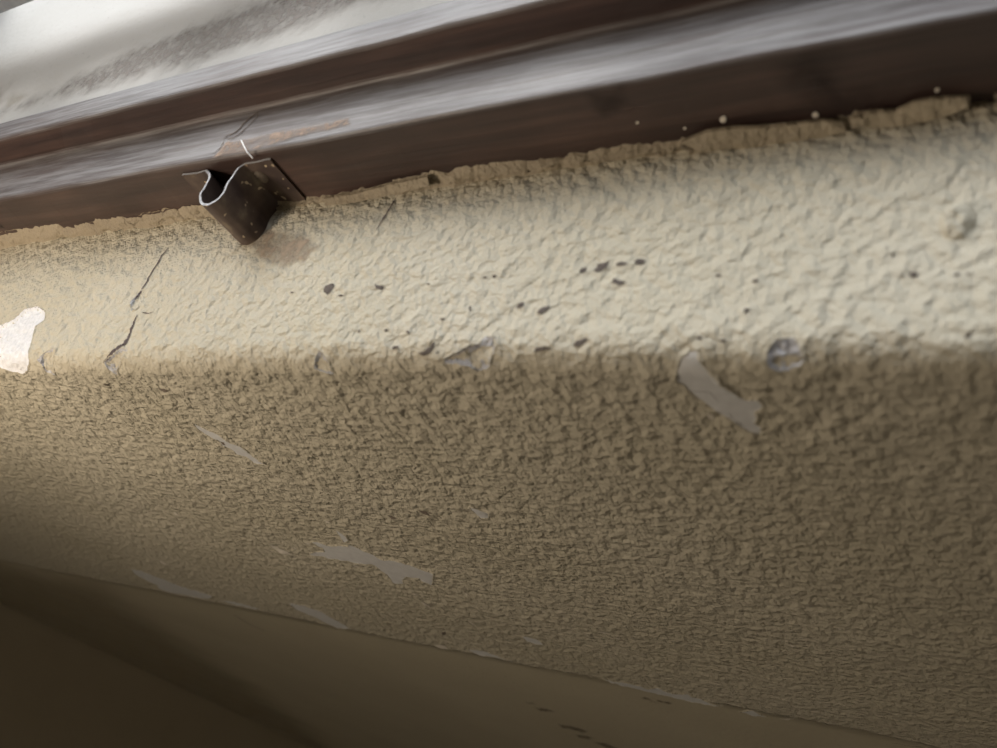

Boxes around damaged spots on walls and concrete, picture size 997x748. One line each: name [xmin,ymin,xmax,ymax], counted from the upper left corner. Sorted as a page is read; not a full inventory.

spalling [579,258,645,273]
spalling [0,305,58,376]
crack [103,247,169,389]
spalling [419,335,501,372]
peeling [672,336,766,435]
peeling [269,529,435,585]
peeling [130,568,267,611]